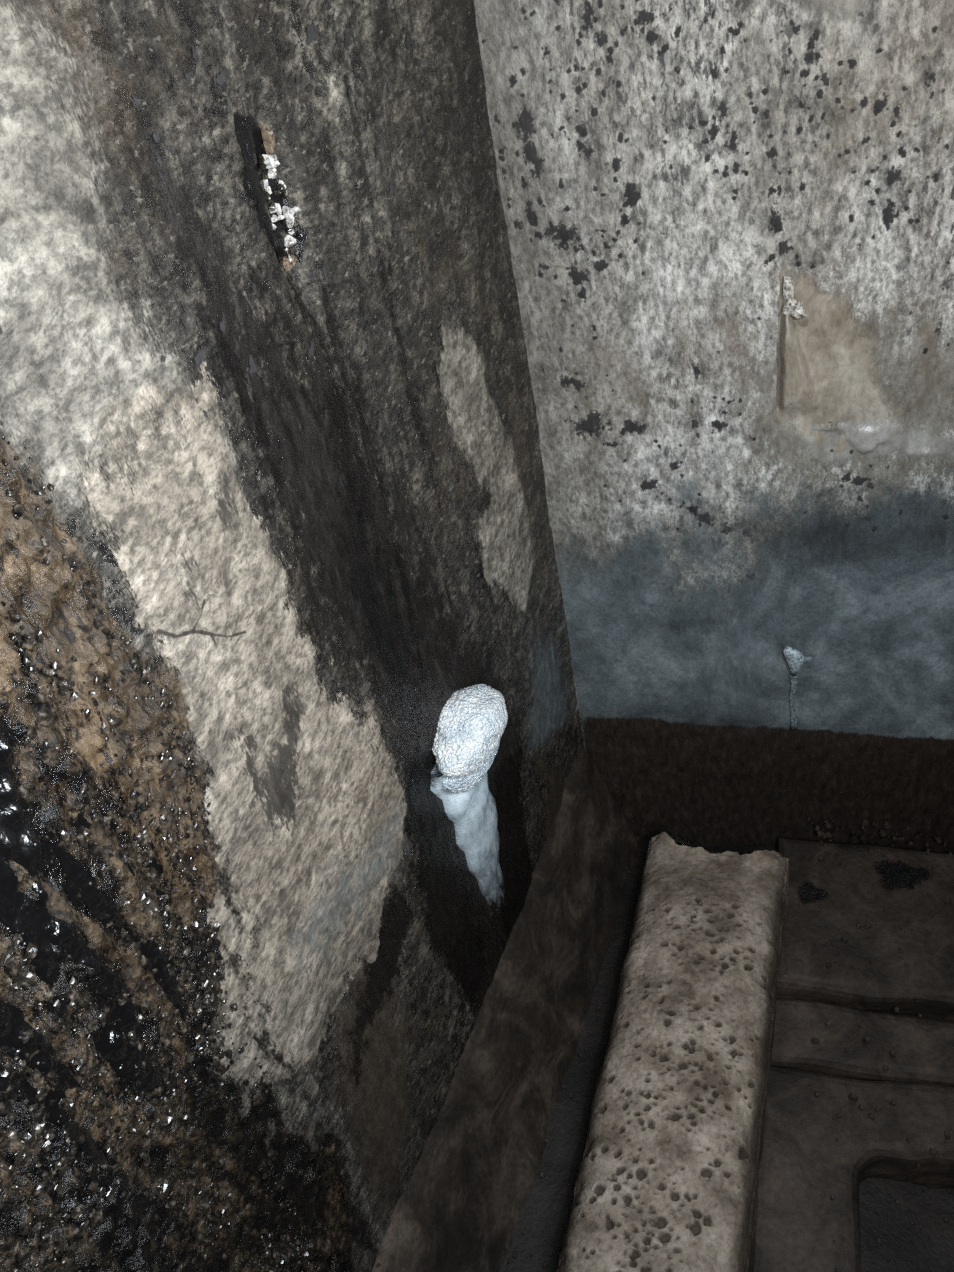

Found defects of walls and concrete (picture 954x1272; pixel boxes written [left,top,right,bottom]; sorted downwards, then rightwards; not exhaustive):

damp [495,0,682,305]
damp [689,101,750,200]
damp [709,21,747,86]
damp [748,88,770,124]
damp [763,20,921,269]
damp [922,54,945,99]
damp [560,369,661,462]
damp [690,396,742,438]
crack [158,599,246,646]
peeling [0,0,407,1116]
damp [557,417,954,749]
damp [181,235,534,1267]